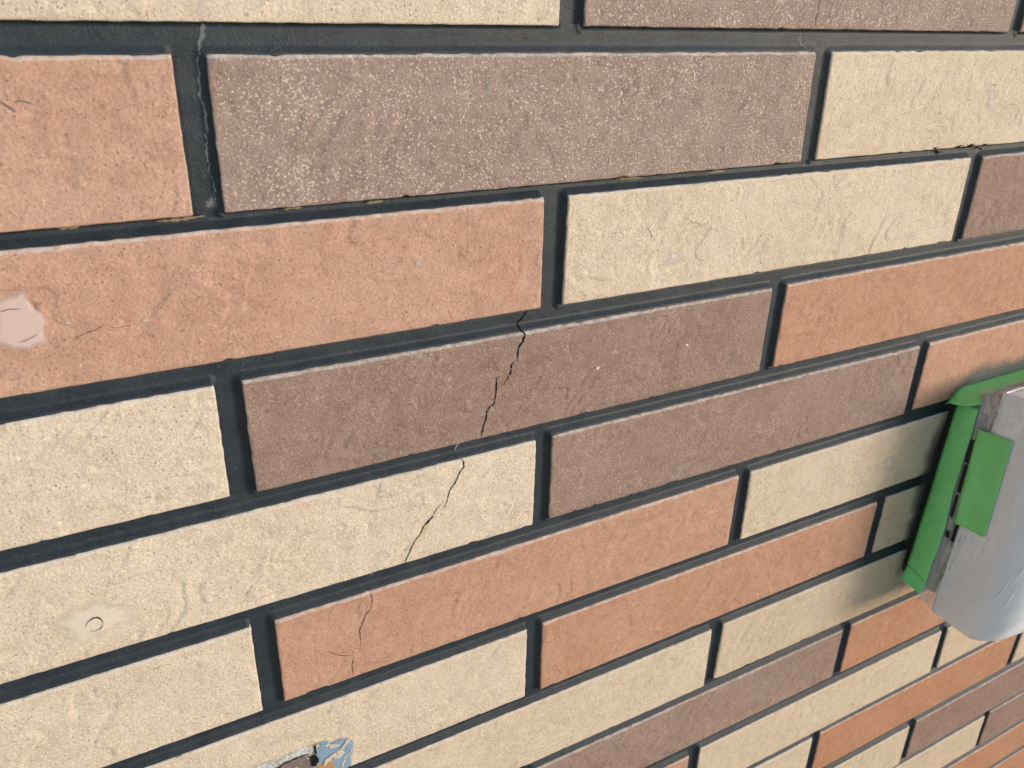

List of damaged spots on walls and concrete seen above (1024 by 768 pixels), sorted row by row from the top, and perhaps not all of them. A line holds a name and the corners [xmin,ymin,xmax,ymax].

crack [481,312,527,435]
crack [405,460,465,563]
crack [331,591,373,676]
spalling [250,737,353,768]